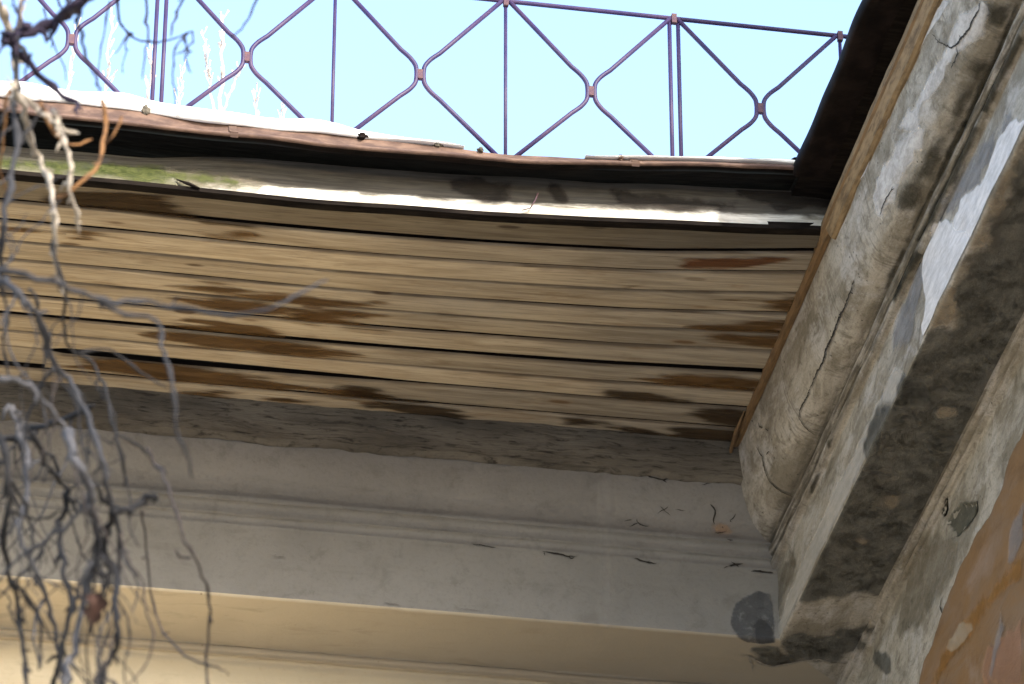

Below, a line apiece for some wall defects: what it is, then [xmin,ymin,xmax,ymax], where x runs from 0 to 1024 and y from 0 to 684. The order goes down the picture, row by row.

crack [932,3,980,68]
leakage [451,177,510,202]
leakage [611,190,733,211]
peeling [974,174,1010,246]
leakage [139,282,387,358]
peeling [929,288,956,326]
leakage [69,359,470,419]
leakage [564,374,759,442]
crack [798,281,854,434]
leakage [799,116,1024,603]
crack [752,421,792,497]
spalling [942,498,979,537]